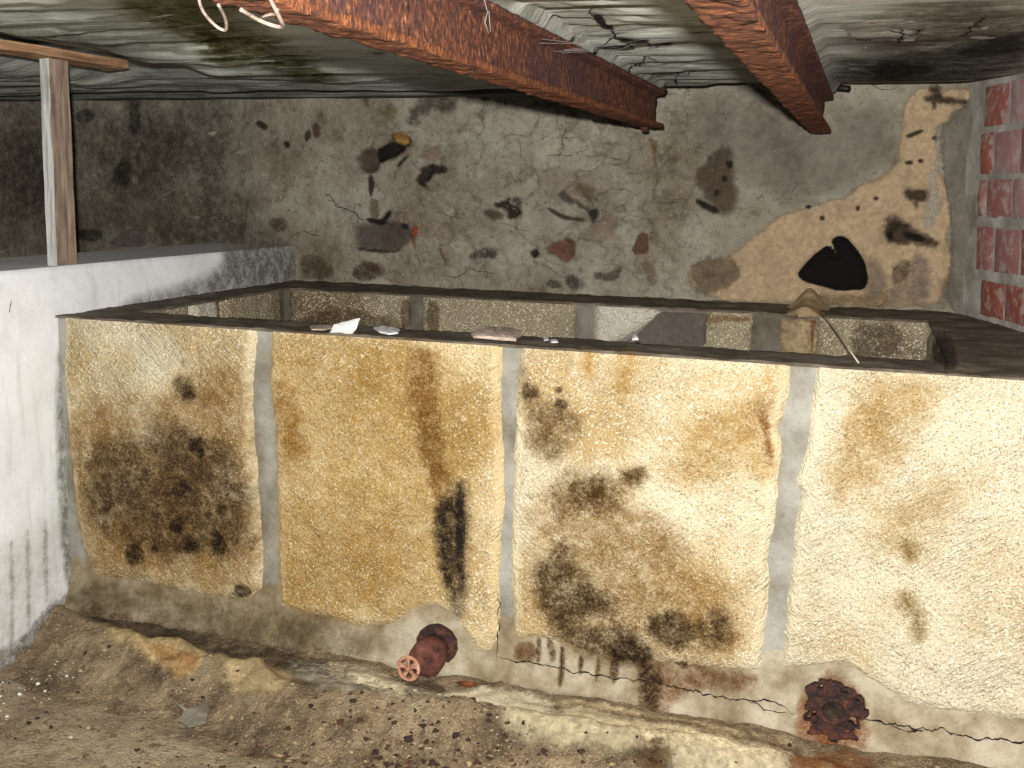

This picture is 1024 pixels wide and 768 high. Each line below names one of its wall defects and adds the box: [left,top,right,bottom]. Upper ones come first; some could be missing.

crack [544,7,697,87]
peeling [689,86,970,307]
leakage [103,438,211,531]
leakage [436,497,464,594]
leakage [540,565,604,636]
leakage [589,631,662,705]
crack [496,594,793,715]
crack [865,719,1024,744]